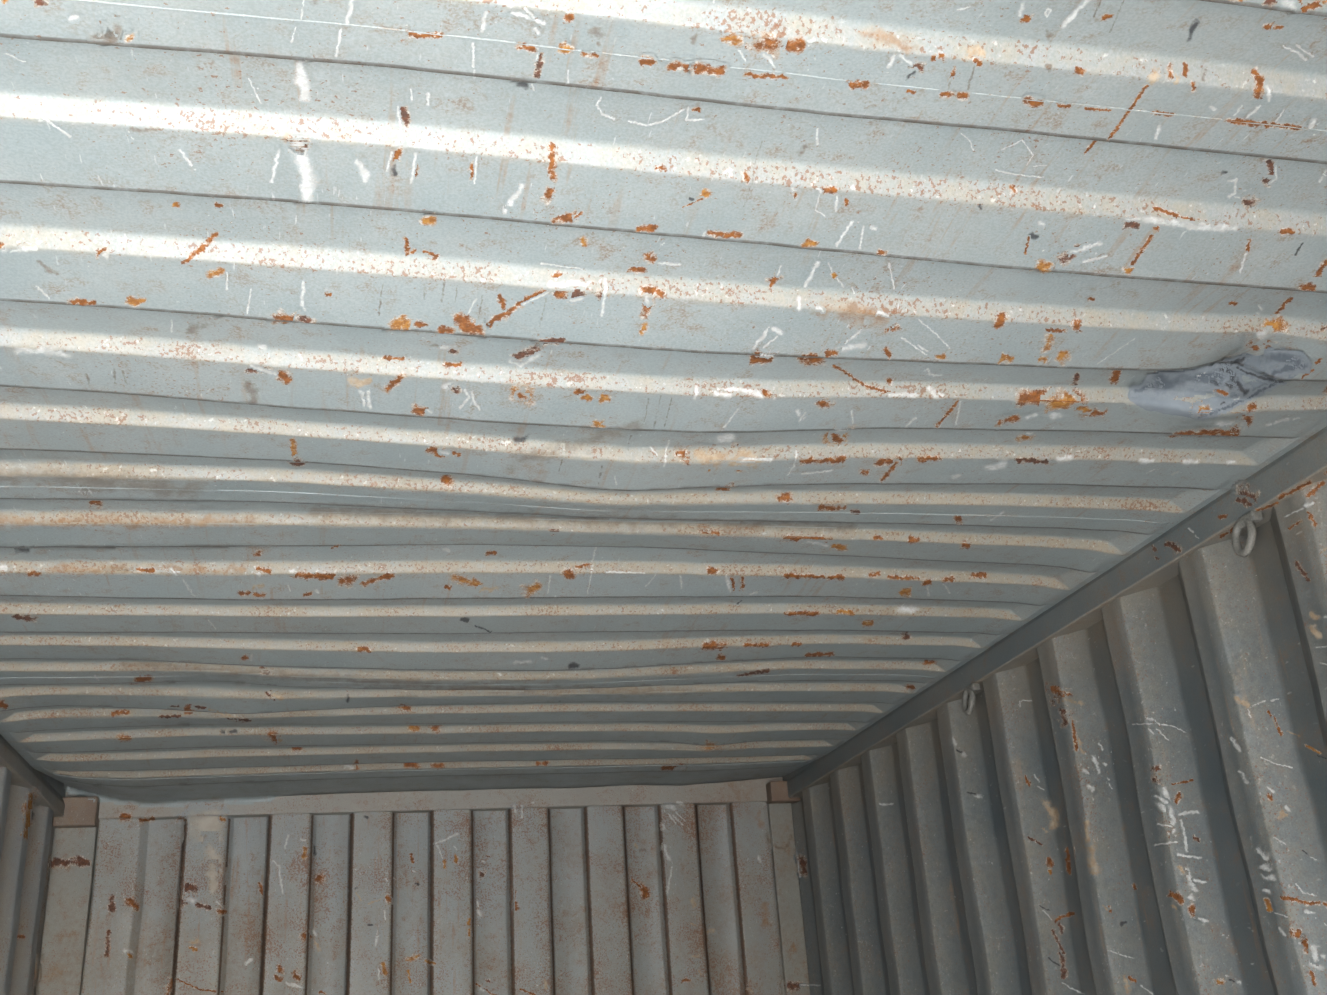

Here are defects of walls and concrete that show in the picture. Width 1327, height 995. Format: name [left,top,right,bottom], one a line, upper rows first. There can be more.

corrosion [404,28,447,43]
corrosion [636,27,816,83]
corrosion [1225,0,1327,33]
corrosion [1020,58,1210,156]
corrosion [1222,63,1304,134]
corrosion [179,230,230,283]
corrosion [1120,159,1279,277]
corrosion [376,268,597,349]
corrosion [377,354,435,418]
corrosion [991,316,1111,467]
corrosion [163,813,231,995]
corrosion [256,812,356,995]